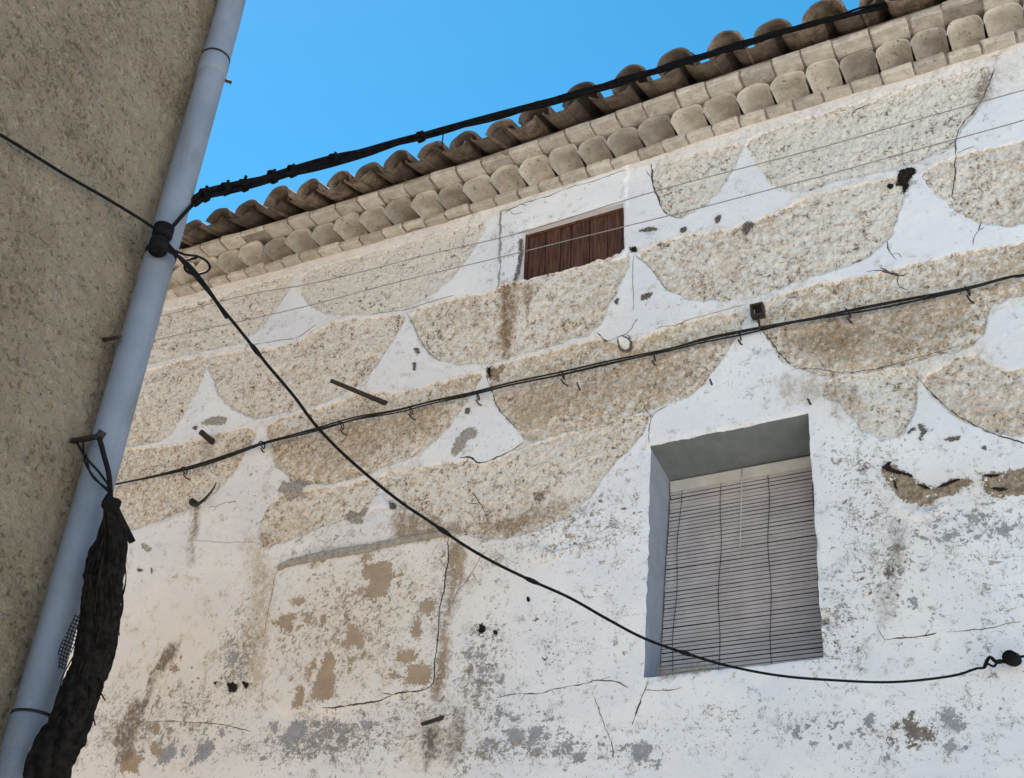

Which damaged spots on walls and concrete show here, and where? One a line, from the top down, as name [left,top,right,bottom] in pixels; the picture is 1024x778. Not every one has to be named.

crack [943,68,995,197]
flaking render [113,67,1024,548]
peeling [214,552,404,758]
crack [323,537,480,709]
crack [496,677,681,756]
crack [877,622,1017,640]